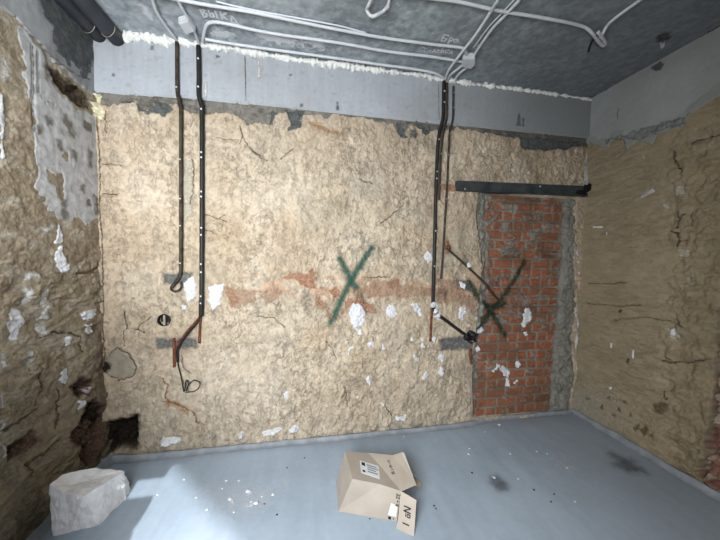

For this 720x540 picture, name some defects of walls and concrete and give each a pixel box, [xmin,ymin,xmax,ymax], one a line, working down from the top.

peeling [17,26,99,273]
flaking render [605,113,691,144]
crack [76,111,151,381]
crack [671,211,693,247]
crack [40,331,83,353]
crack [1,367,60,473]
spalling [58,368,106,465]